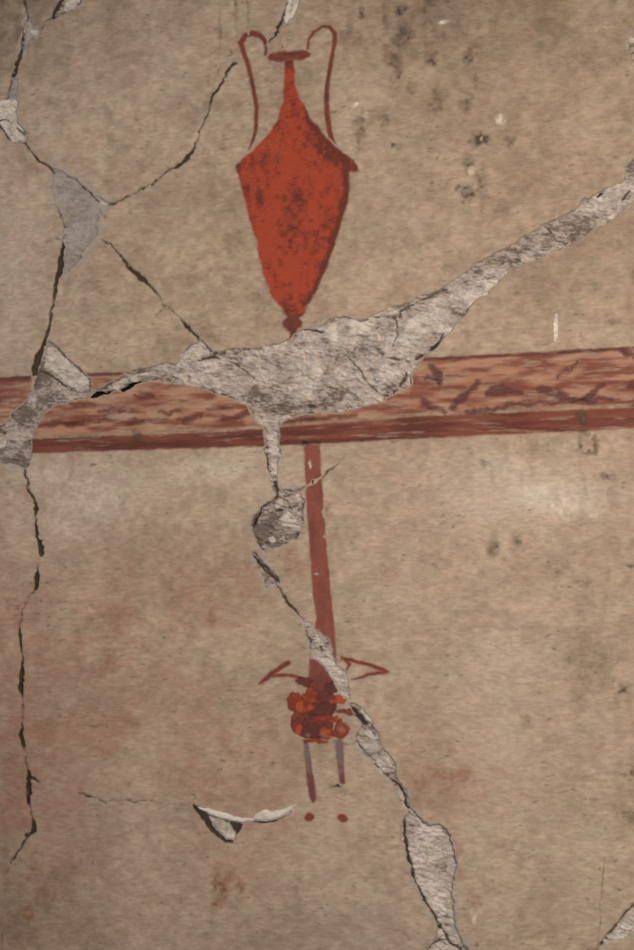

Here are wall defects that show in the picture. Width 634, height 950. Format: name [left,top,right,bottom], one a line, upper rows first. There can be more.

flaking render [0,77,29,145]
crack [110,62,237,205]
flaking render [493,112,508,126]
crack [32,225,66,388]
crack [103,240,156,292]
flaking render [0,160,634,588]
crack [24,472,44,590]
crack [17,628,25,697]
crack [8,770,36,869]
flaking render [193,804,296,843]
flaking render [302,621,468,950]
flaking render [600,903,634,945]